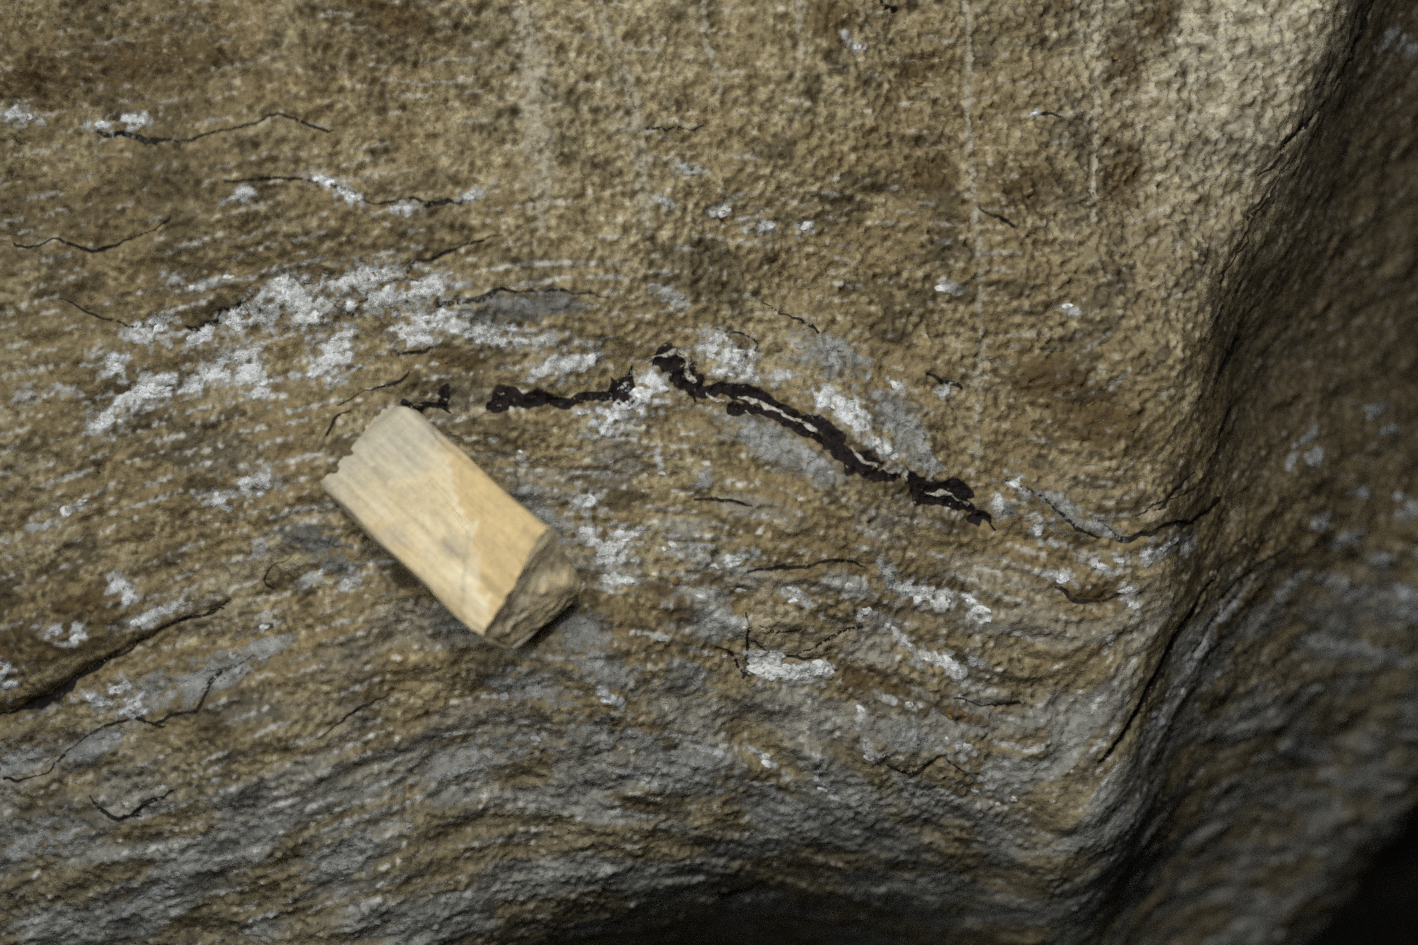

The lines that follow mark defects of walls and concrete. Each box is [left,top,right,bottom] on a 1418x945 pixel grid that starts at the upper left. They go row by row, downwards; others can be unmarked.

crack [879,0,898,13]
crack [97,112,334,145]
crack [224,176,475,207]
crack [979,207,1015,228]
crack [303,235,611,308]
efflorescence [13,257,605,441]
crack [326,344,451,436]
efflorescence [573,366,682,440]
crack [486,272,1283,543]
crack [747,558,866,572]
crack [0,600,228,715]
crack [1098,547,1290,763]